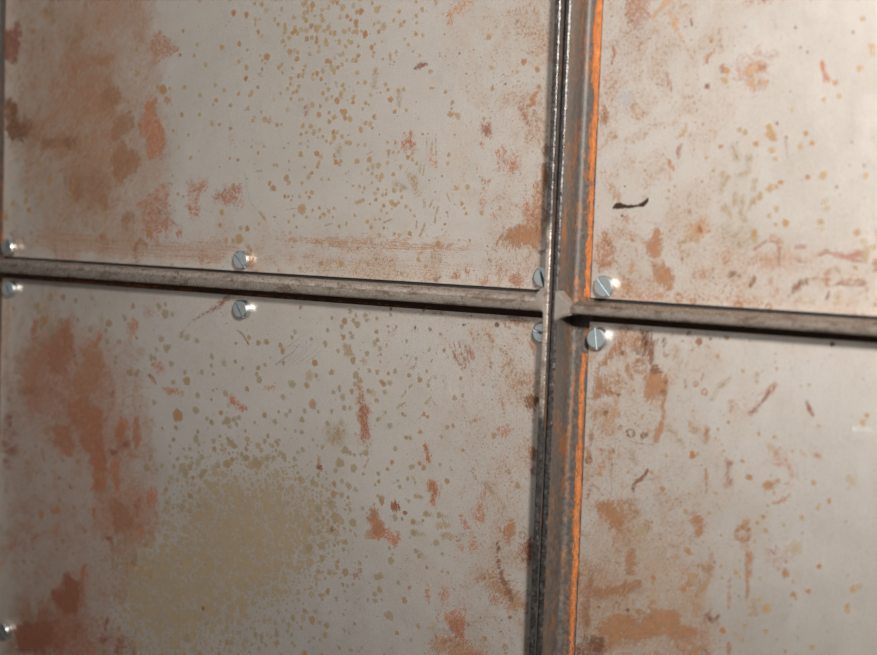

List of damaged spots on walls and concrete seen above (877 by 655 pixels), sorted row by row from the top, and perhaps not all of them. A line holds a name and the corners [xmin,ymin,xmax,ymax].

corrosion [4,20,35,65]
corrosion [1,94,33,253]
corrosion [310,145,469,272]
corrosion [480,121,492,148]
corrosion [478,144,549,288]
crack [612,197,649,209]
corrosion [715,373,779,439]
corrosion [307,446,369,576]
corrosion [568,325,723,655]